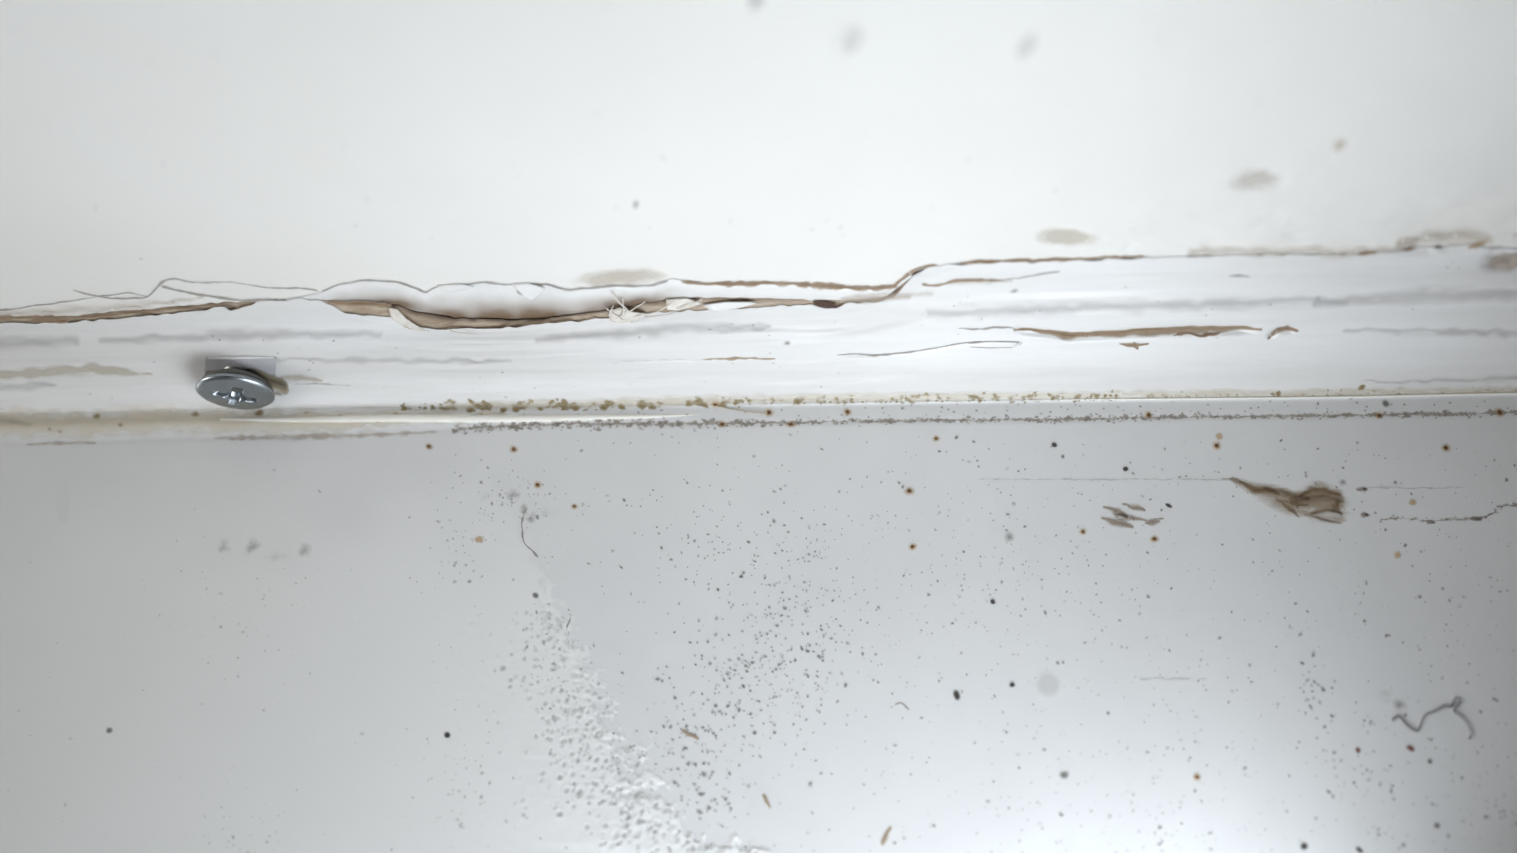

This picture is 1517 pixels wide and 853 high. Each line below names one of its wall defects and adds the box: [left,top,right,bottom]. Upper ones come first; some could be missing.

crack [0,255,1144,335]
crack [959,326,1299,350]
peeling [0,454,774,853]